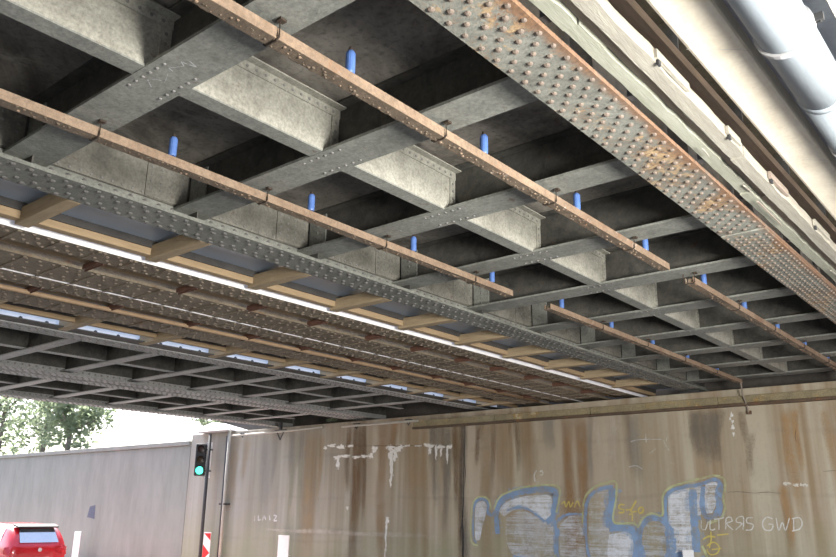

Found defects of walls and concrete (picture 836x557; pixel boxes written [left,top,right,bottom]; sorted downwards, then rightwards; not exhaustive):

rust [344,414,430,557]
rust [450,410,498,557]
water stain [687,408,756,479]